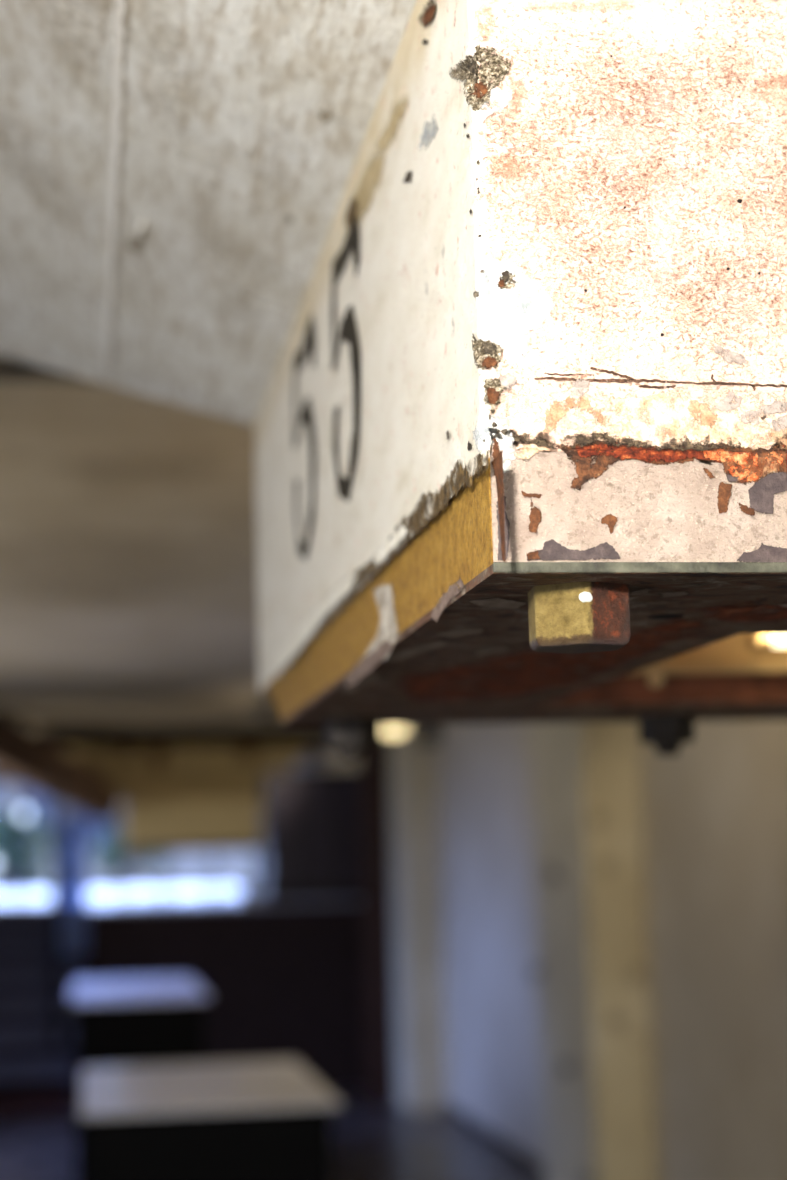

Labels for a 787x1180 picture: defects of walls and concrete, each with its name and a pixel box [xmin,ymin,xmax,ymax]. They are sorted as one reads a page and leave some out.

spalling [449,45,512,138]
spalling [496,271,516,290]
crack [534,367,787,391]
peeling [275,334,527,694]
corrosion [494,432,787,564]
peeling [726,472,787,514]
peeling [526,539,620,561]
peeling [737,543,787,562]